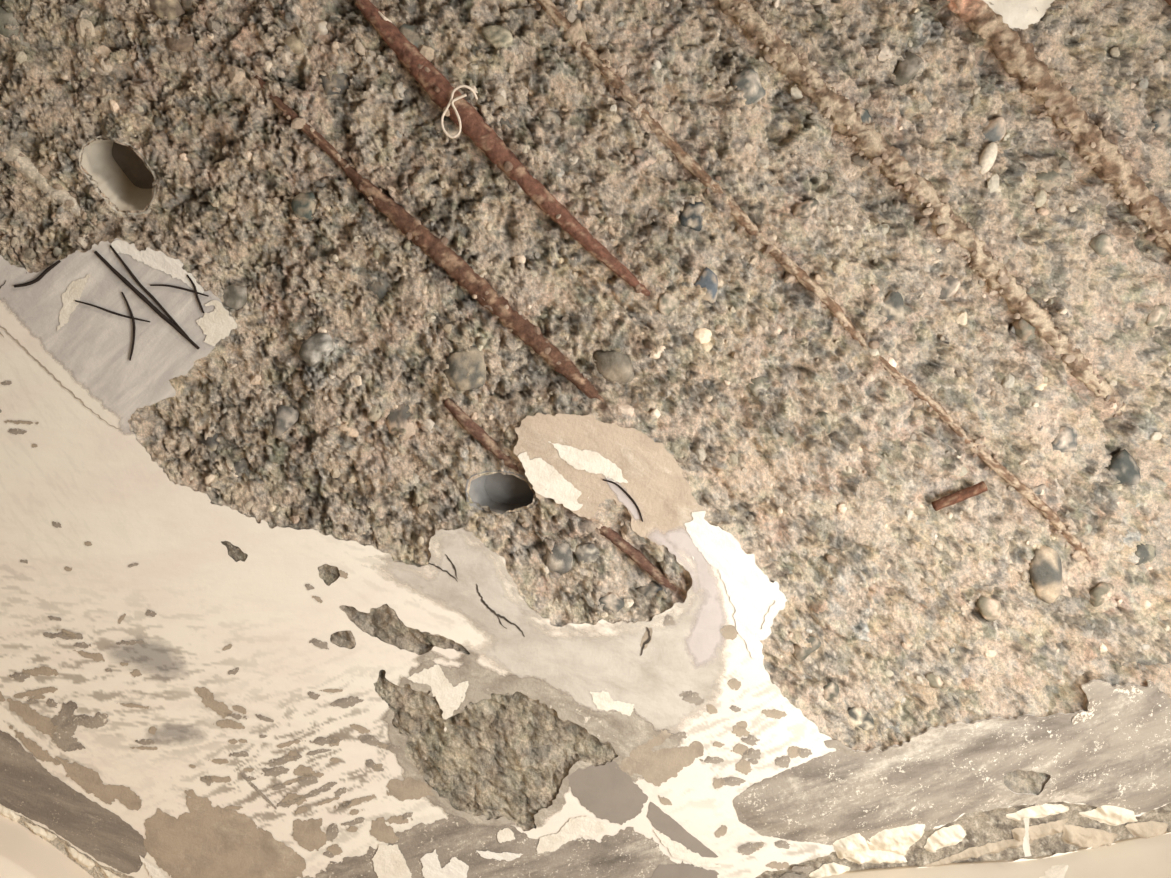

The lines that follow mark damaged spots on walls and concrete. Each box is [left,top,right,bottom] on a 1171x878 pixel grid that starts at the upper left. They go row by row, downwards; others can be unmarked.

crack [0,326,122,430]
peeling [0,240,222,434]
spalling [301,124,604,402]
spalling [454,98,650,296]
spalling [717,0,1115,398]
spalling [947,0,1171,255]
spalling [330,604,470,655]
peeling [513,413,706,545]
spalling [596,526,677,592]
spalling [931,481,988,511]
spalling [0,670,719,878]
peeling [733,681,1171,878]